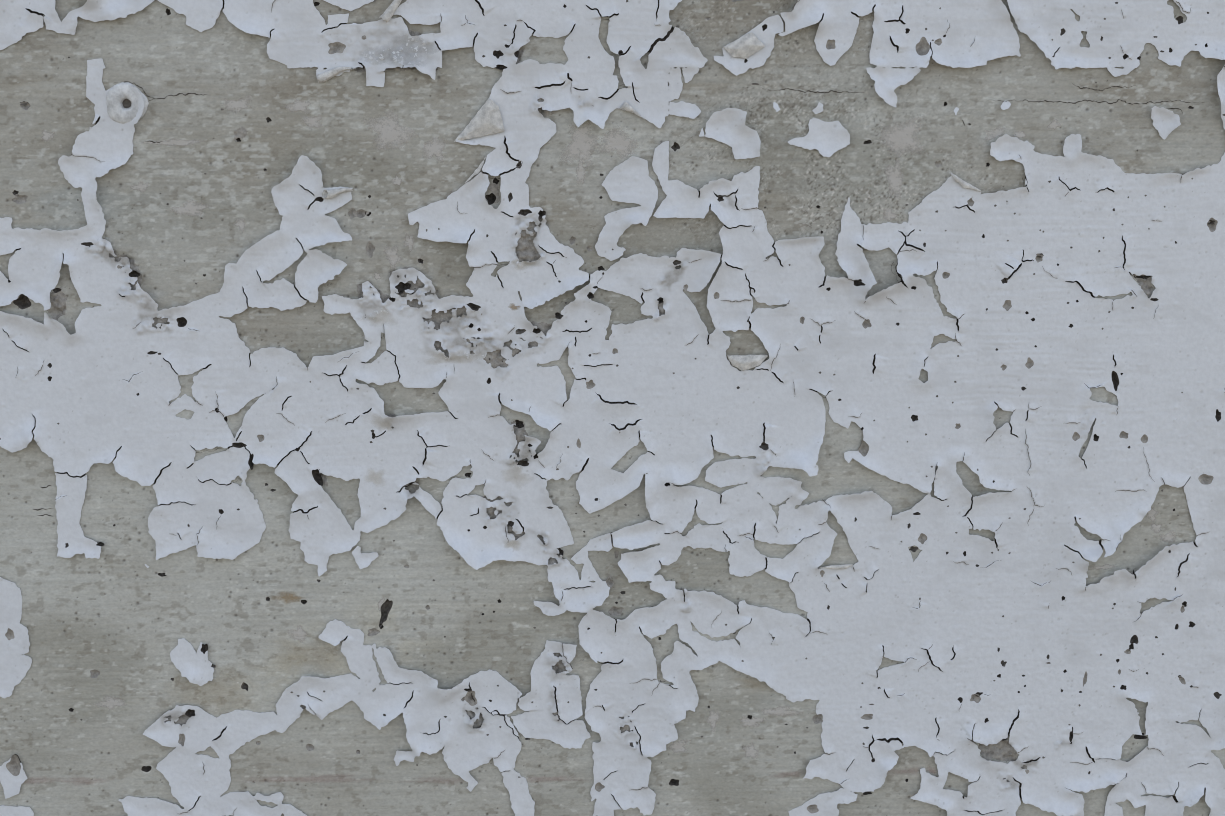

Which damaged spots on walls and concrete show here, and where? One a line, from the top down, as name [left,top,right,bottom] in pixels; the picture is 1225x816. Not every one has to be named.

crack [502,73,588,94]
crack [762,86,864,94]
crack [539,246,567,279]
crack [1004,250,1057,282]
crack [324,352,386,437]
crack [562,328,641,433]
crack [417,430,448,465]
crack [1025,405,1042,524]
peeling [0,342,1214,816]
crack [884,644,956,698]